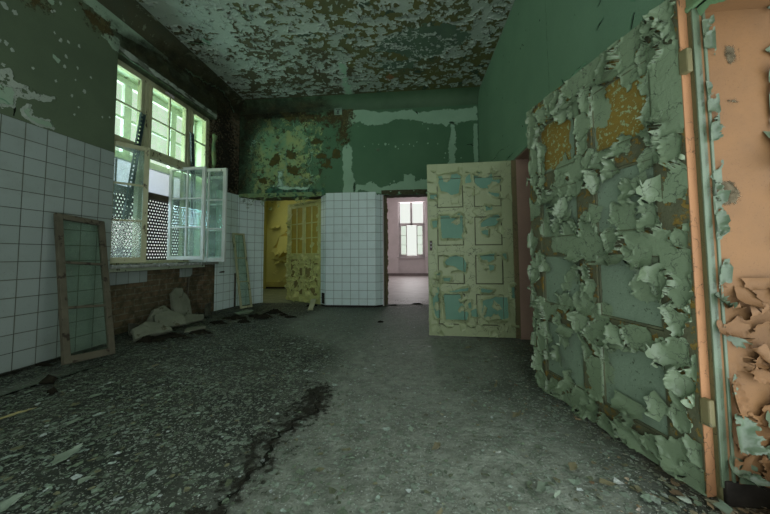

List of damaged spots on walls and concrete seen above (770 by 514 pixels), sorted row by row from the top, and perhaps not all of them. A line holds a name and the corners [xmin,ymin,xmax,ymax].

peeling [702,14,717,55]
peeling [0,63,58,130]
peeling [706,81,725,141]
flaking render [74,0,325,335]
peeling [341,105,512,204]
peeling [710,160,731,240]
peeling [525,0,707,496]
peeling [428,275,445,332]
peeling [713,499,733,514]